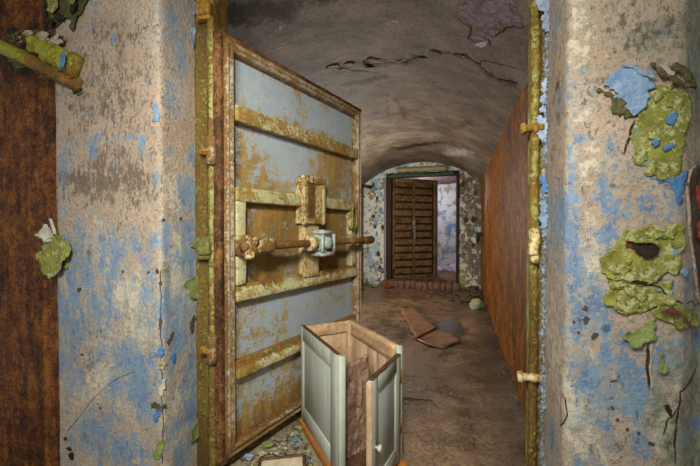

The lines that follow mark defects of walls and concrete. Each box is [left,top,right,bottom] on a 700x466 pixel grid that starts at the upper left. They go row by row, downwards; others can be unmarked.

crack [325,52,519,87]
peeling [451,0,524,48]
peeling [34,219,71,281]
peeling [368,181,384,273]
peeling [536,0,550,466]
peeling [596,62,700,349]
peeling [658,351,669,374]
crack [663,365,698,466]